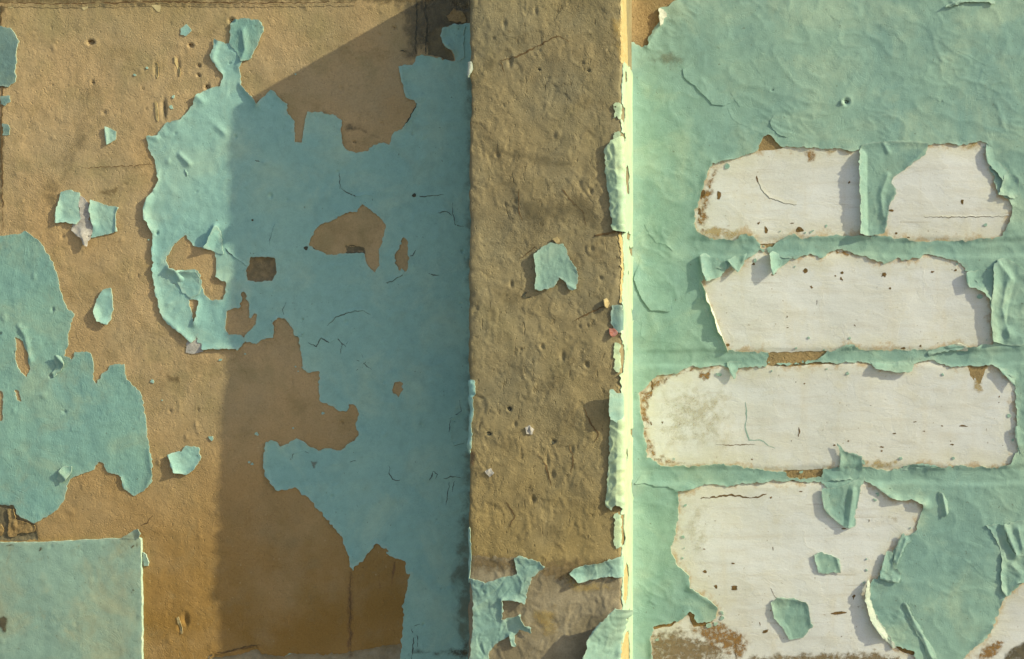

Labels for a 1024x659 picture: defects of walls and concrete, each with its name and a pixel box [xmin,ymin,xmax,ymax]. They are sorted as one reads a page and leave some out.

peeling [0,26,19,106]
peeling [104,127,116,145]
peeling [55,190,118,247]
crack [756,176,797,205]
crack [308,307,372,371]
peeling [143,0,675,659]
peeling [0,231,153,541]
peeling [639,135,1024,659]
crack [701,492,767,500]